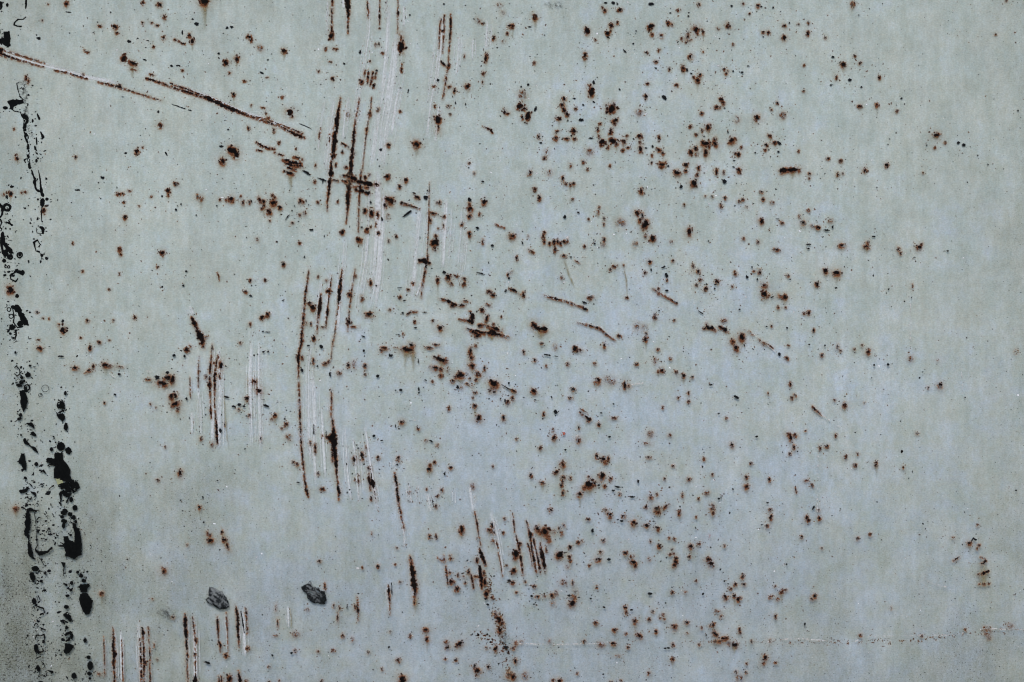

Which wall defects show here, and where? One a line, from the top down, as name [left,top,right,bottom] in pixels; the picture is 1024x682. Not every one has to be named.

corrosion [520,1,854,249]
peeling [0,85,49,276]
corrosion [0,0,792,521]
corrosion [800,263,852,289]
peeling [9,294,31,354]
corrosion [801,310,888,363]
peeling [15,363,38,420]
peeling [17,391,93,682]
corrosion [376,429,852,682]
corrosion [97,607,283,682]
corrosion [831,621,1024,647]